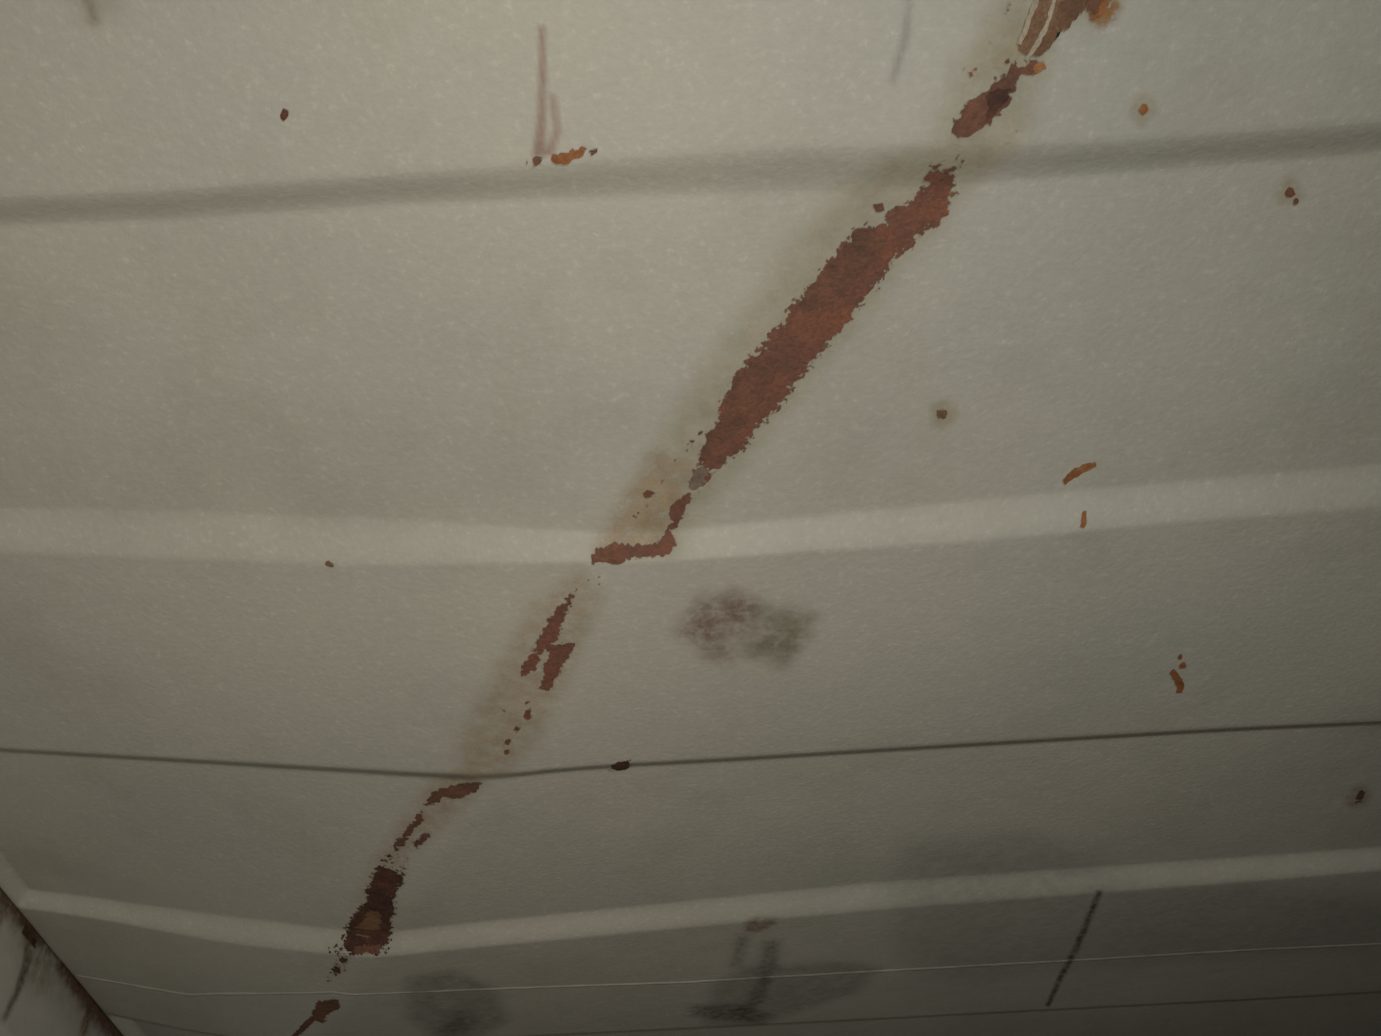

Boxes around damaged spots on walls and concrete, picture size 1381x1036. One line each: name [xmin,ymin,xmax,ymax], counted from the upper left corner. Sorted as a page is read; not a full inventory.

rust [526,130,597,167]
rust [1063,462,1096,485]
rust [1170,654,1186,693]
rust [0,887,124,1036]